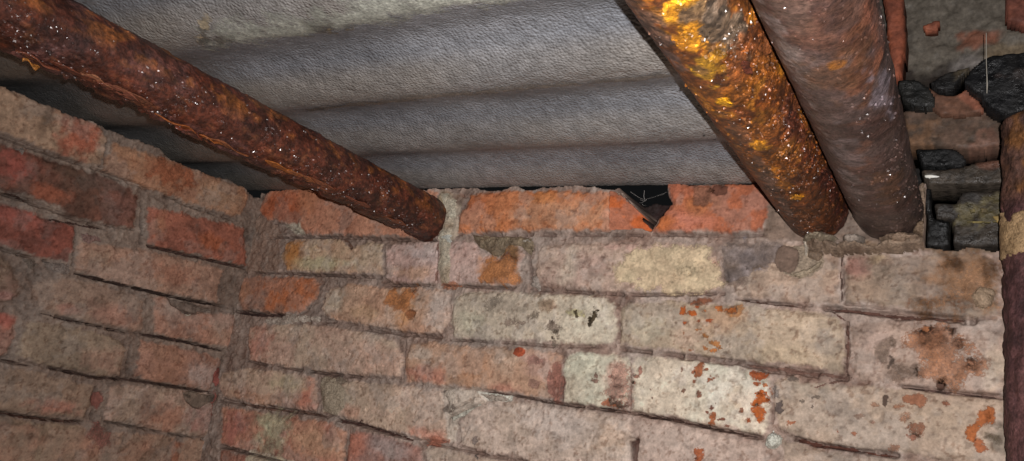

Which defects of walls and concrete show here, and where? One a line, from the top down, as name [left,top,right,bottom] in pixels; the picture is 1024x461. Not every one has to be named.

corrosion [16,50,249,157]
corrosion [265,160,371,208]